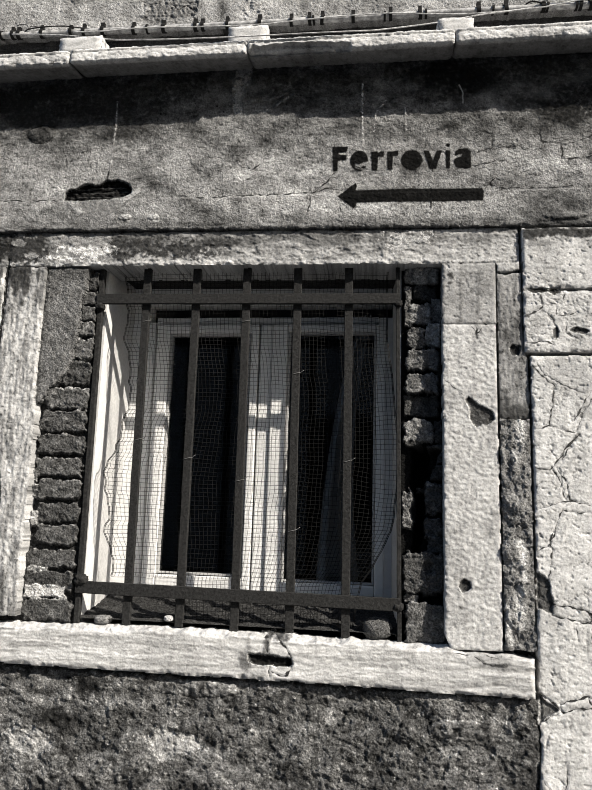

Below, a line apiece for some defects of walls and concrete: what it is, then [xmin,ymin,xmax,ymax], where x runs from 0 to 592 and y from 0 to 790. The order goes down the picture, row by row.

spalling [65,179,141,218]
crack [526,292,578,345]
flaking render [0,232,241,623]
spalling [466,397,495,428]
flaking render [401,267,447,645]
crack [533,364,592,579]
crack [553,604,592,640]
spalling [247,652,293,667]
crack [543,696,592,722]